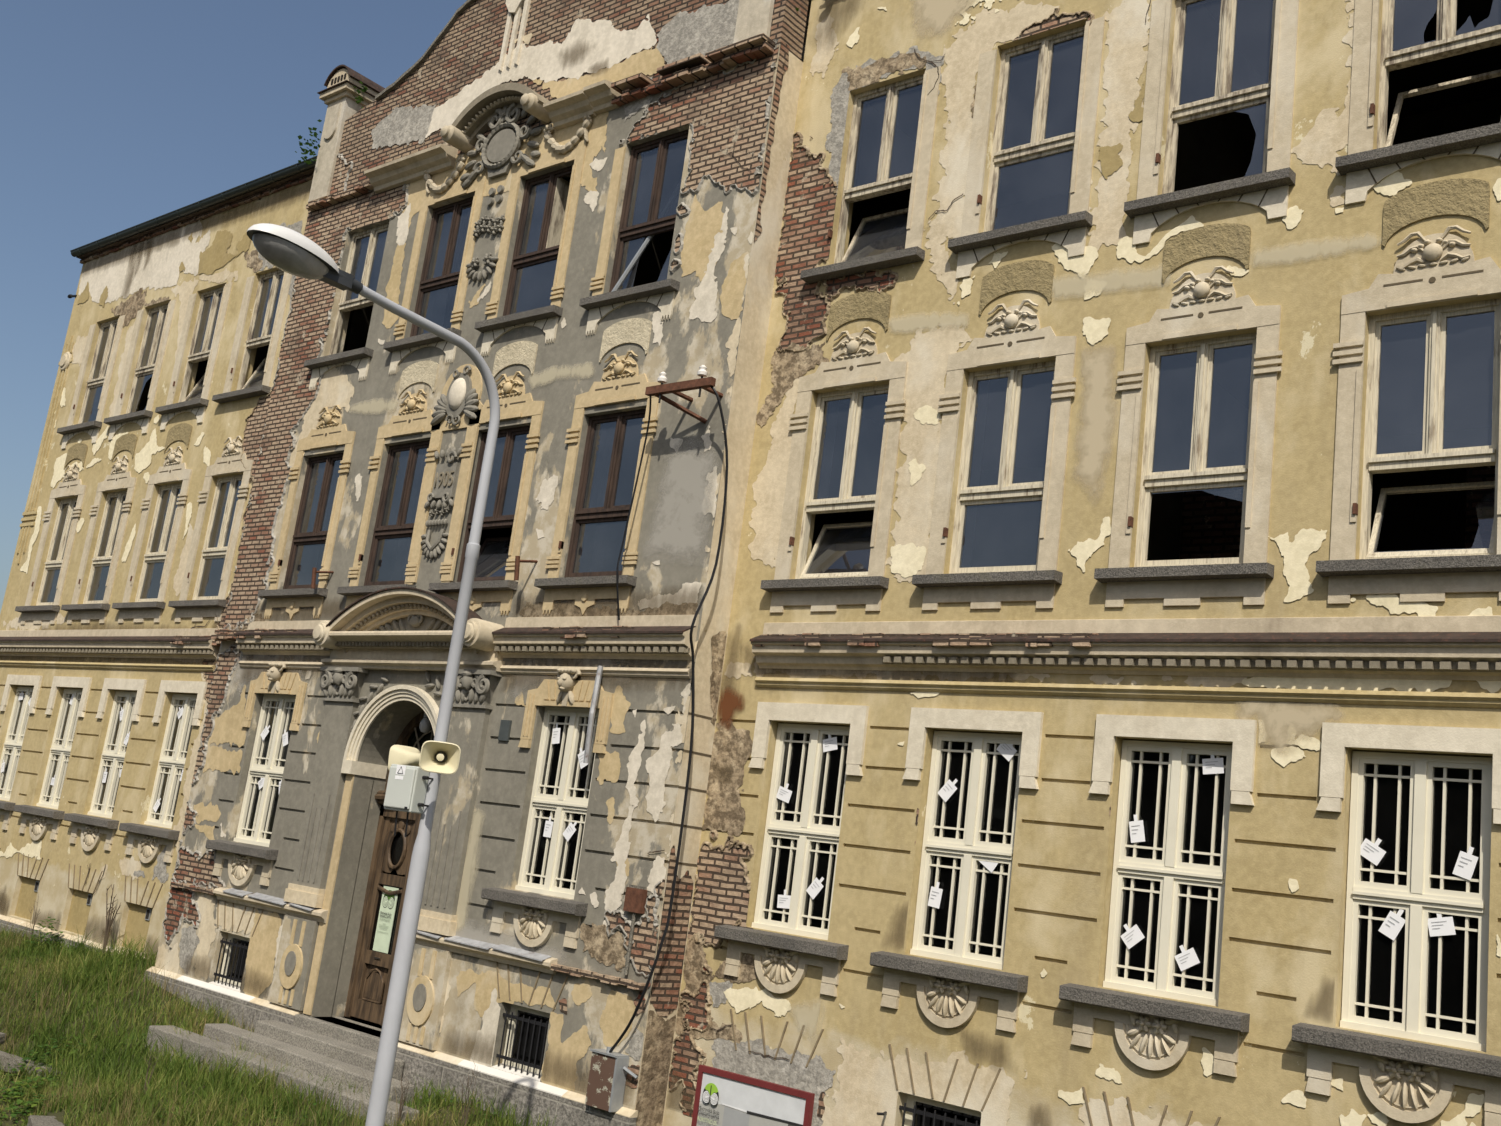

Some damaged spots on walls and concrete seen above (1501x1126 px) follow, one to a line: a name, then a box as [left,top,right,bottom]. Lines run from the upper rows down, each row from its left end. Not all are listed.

peeling [51,220,263,488]
flaking render [155,276,354,998]
peeling [425,14,665,138]
flaking render [304,39,790,404]
flaking render [519,545,710,617]
flaking render [748,131,899,568]
flaking render [885,324,972,583]
flaking render [810,0,1204,345]
peeling [1068,517,1111,572]
peeling [1268,528,1327,602]
flaking render [439,631,1050,1126]
flaking render [1058,1063,1203,1126]